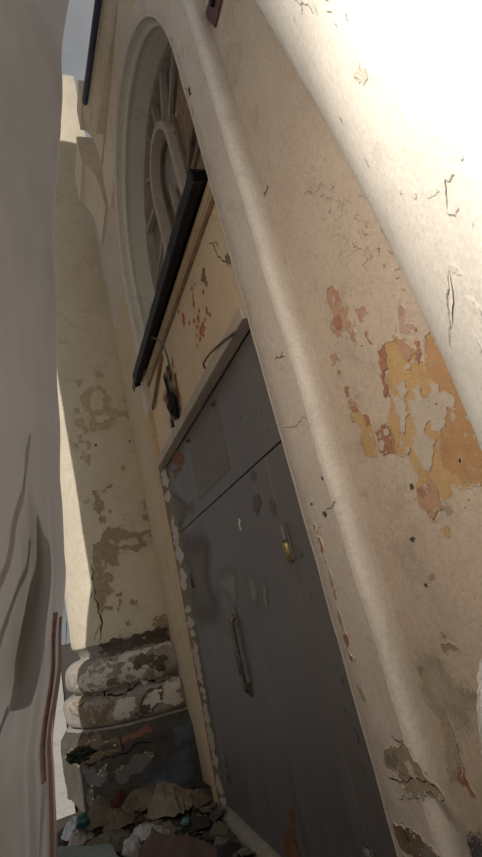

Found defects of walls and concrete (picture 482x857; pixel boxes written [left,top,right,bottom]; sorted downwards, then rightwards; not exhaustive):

crack [444,157,473,226]
crack [446,264,461,341]
peeling [73,371,130,466]
peeling [324,284,482,538]
peeling [171,515,187,591]
crack [91,564,103,642]
spalling [64,482,183,812]
peeling [185,605,226,806]
spalling [382,737,450,810]
spalling [386,807,443,857]
leakage [464,827,482,857]